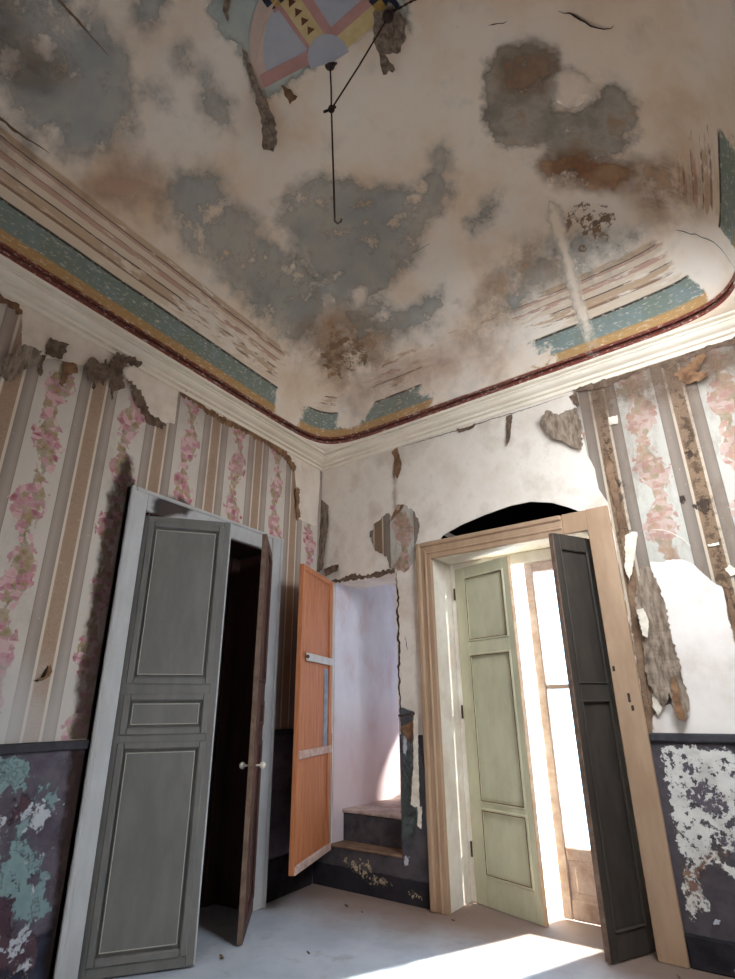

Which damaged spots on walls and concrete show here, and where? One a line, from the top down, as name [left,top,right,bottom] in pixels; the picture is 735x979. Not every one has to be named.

crack [559,11,614,30]
leakage [482,44,638,171]
leakage [306,316,386,378]
peeling [0,755,66,979]
peeling [660,744,735,925]